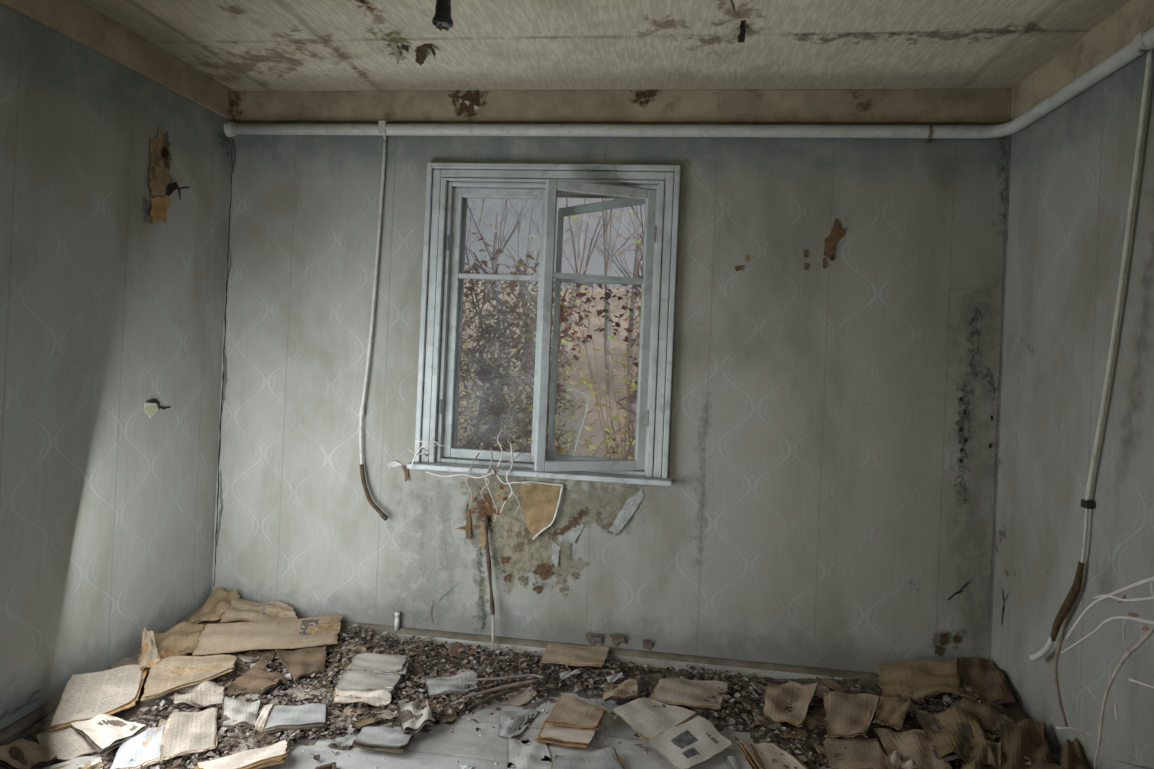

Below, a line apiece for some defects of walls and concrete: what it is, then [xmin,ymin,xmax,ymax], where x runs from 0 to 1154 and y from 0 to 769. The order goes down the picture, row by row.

leakage [357,0,436,66]
leakage [197,35,351,81]
leakage [449,90,487,118]
leakage [631,89,658,106]
peeling [150,196,171,224]
flaking render [464,474,644,594]